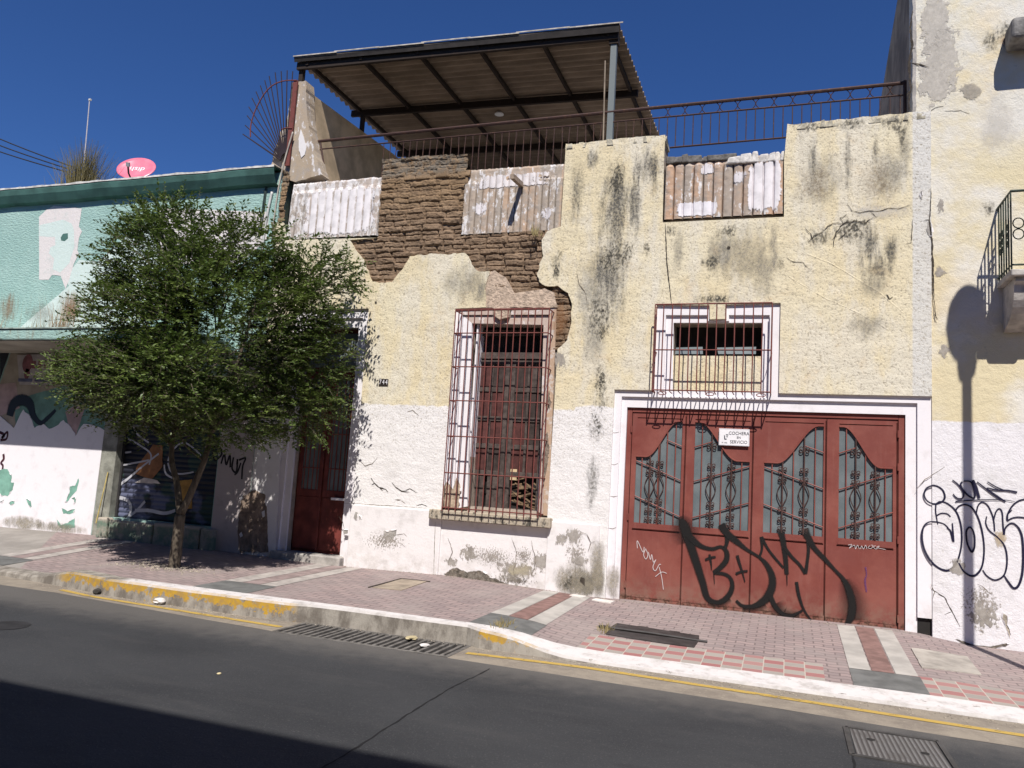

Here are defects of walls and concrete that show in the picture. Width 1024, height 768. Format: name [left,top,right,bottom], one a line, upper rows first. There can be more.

peeling [918,0,982,107]
spalling [301,154,572,370]
damp [590,154,657,338]
damp [811,220,895,278]
crack [789,193,938,320]
crack [340,461,426,529]
peeling [362,529,407,552]
peeling [445,544,546,585]
damp [558,546,619,594]
peeling [949,558,1011,648]